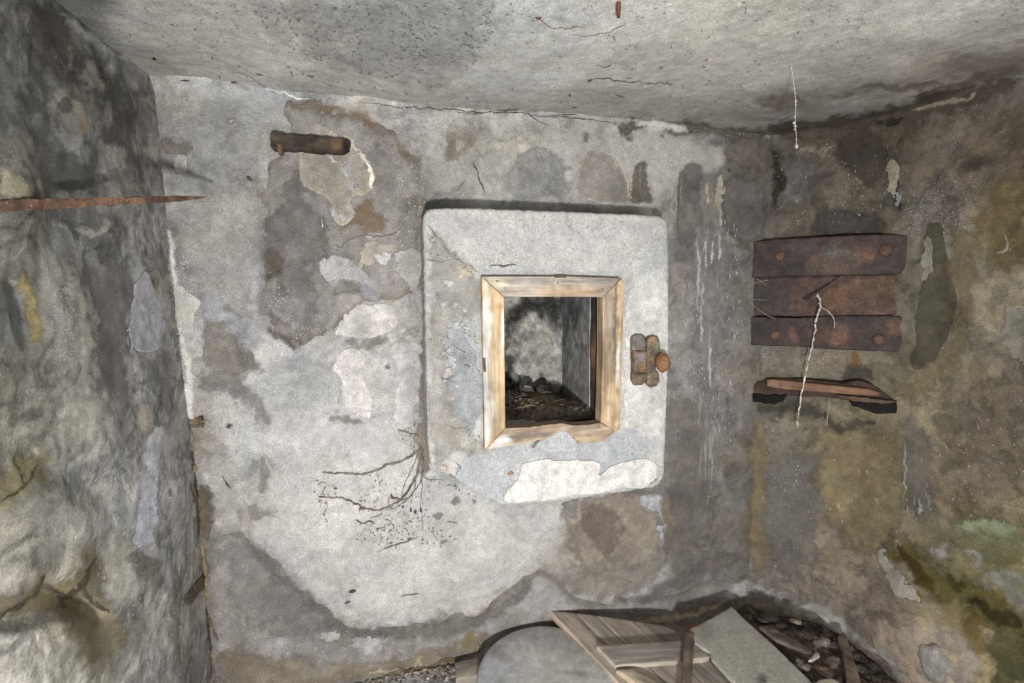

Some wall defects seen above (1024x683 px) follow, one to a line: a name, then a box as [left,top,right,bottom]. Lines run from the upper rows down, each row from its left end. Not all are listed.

crack [536,15,624,37]
crack [588,65,673,97]
water stain [477,125,570,204]
water stain [618,69,1024,403]
flaking render [261,99,484,470]
peeling [503,459,657,519]
water stain [930,545,947,558]
water stain [967,549,1024,612]